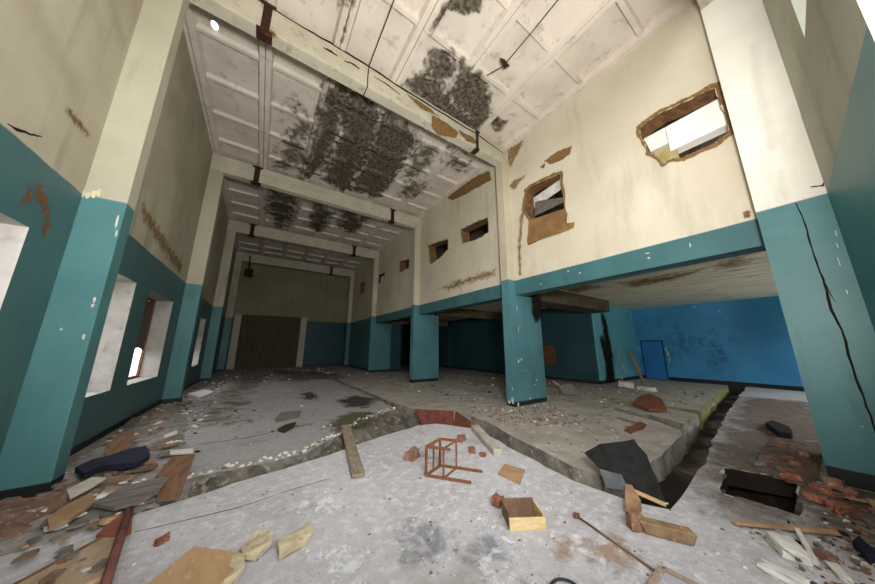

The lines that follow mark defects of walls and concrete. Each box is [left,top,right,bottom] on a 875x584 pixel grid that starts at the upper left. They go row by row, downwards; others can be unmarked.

damp [433,0,482,28]
damp [273,79,472,198]
spalling [408,95,476,144]
damp [401,48,507,132]
flaking render [636,82,734,167]
corrosion [24,185,50,235]
damp [264,189,368,233]
peeling [448,172,491,200]
peeling [523,146,572,223]
crack [795,182,875,432]